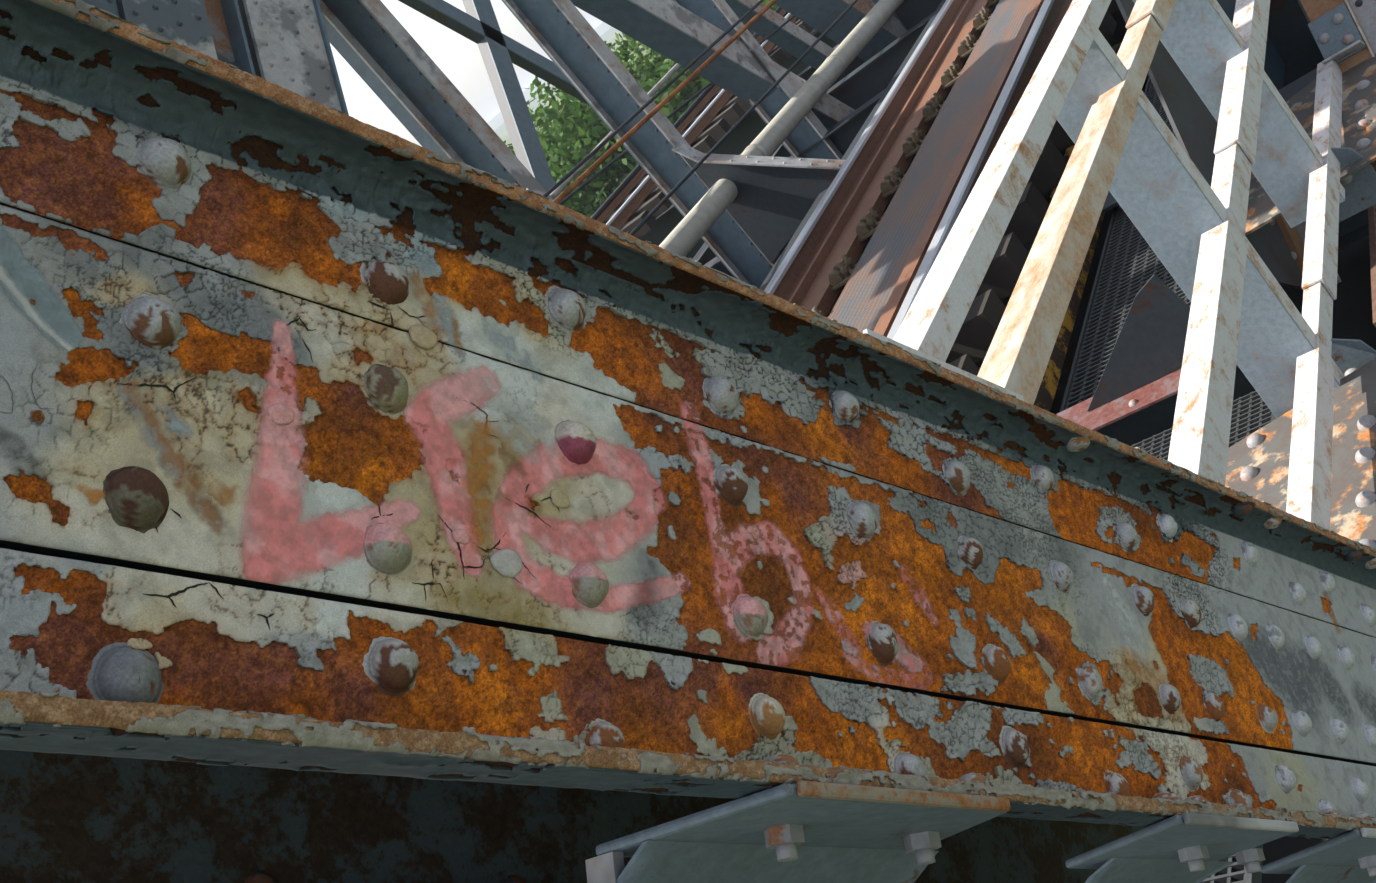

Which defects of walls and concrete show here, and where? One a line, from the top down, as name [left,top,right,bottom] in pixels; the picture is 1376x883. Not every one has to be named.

peeling [0,10,112,69]
peeling [0,90,390,292]
peeling [76,9,1217,585]
crack [144,582,224,608]
corrosion [468,422,494,544]
peeling [0,288,1314,826]
peeling [1118,441,1376,564]
peeling [1321,814,1376,839]